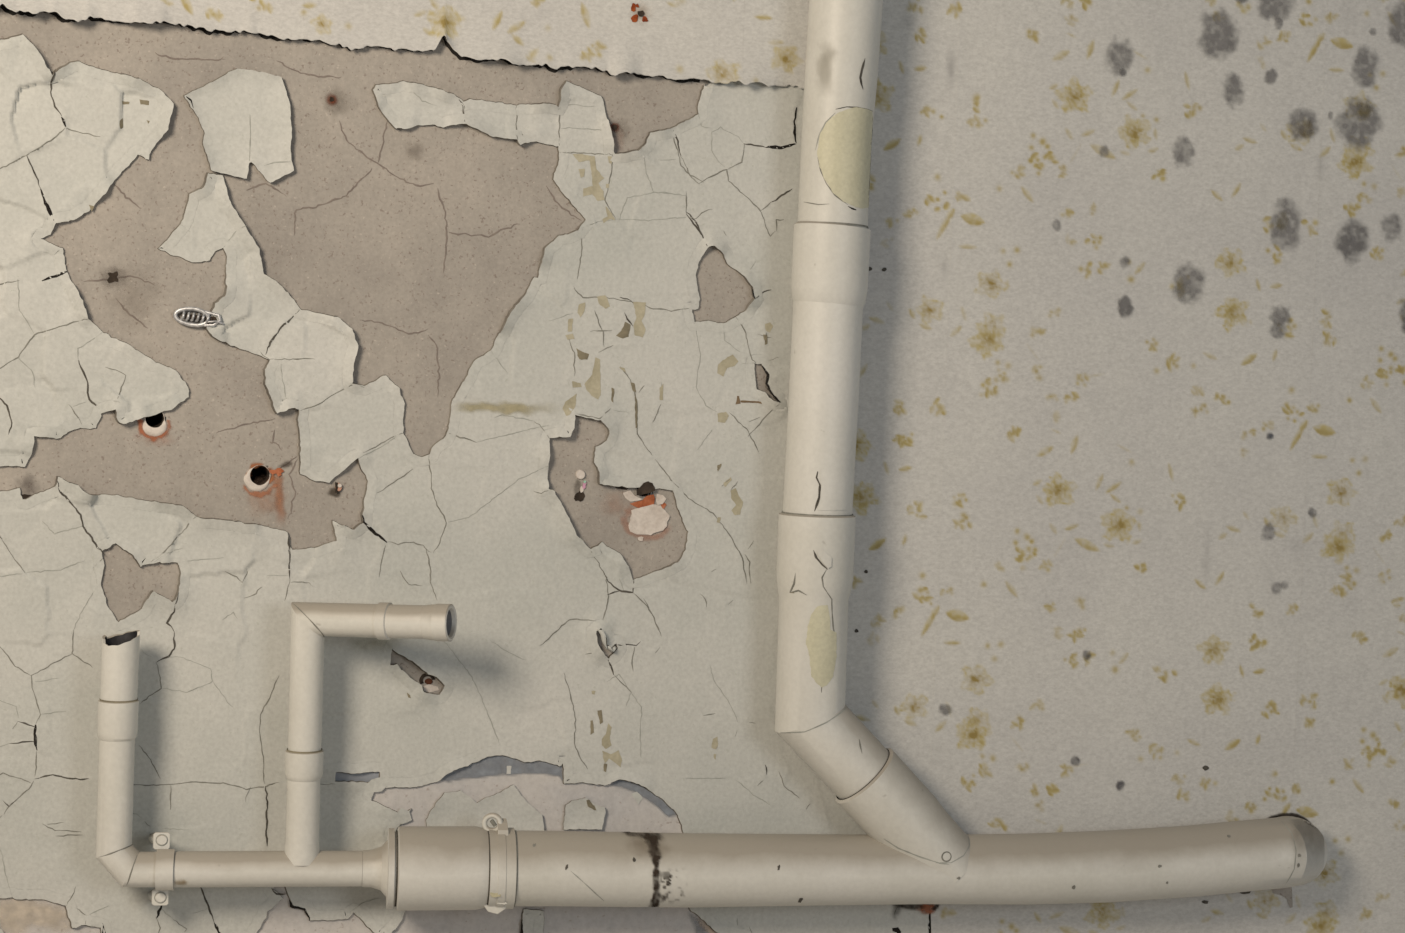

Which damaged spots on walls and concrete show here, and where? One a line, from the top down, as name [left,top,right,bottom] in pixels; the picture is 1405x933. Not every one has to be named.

damp [1203,13,1235,54]
crack [0,69,100,221]
damp [1342,104,1378,145]
peeling [0,4,713,589]
crack [550,104,797,607]
peeling [683,236,787,423]
damp [1119,296,1133,316]
damp [1338,225,1367,257]
crack [0,481,105,814]
peeling [90,533,191,632]
crack [133,523,312,845]
peeling [246,887,753,933]